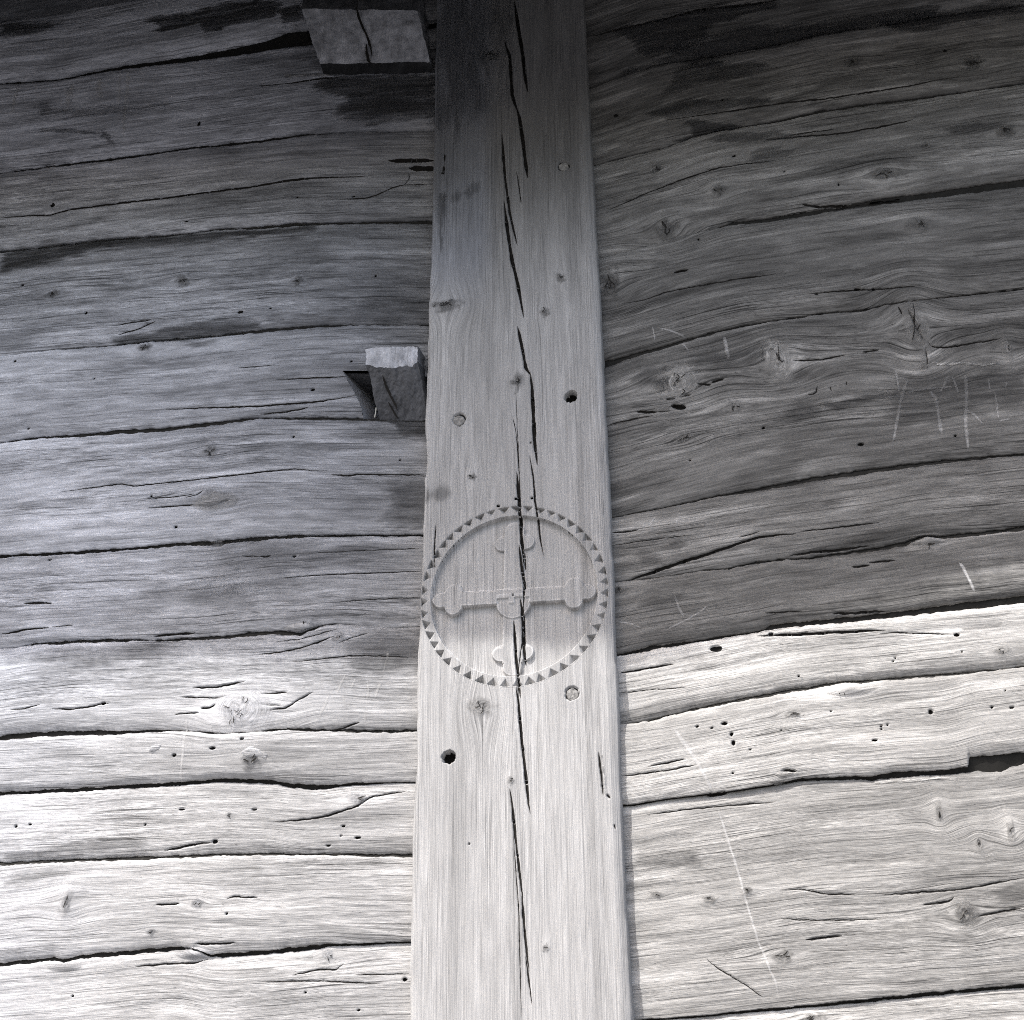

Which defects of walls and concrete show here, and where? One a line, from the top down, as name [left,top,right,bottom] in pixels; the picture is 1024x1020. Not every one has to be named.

crack [488,1,548,1003]
crack [598,752,696,798]
crack [647,791,772,815]